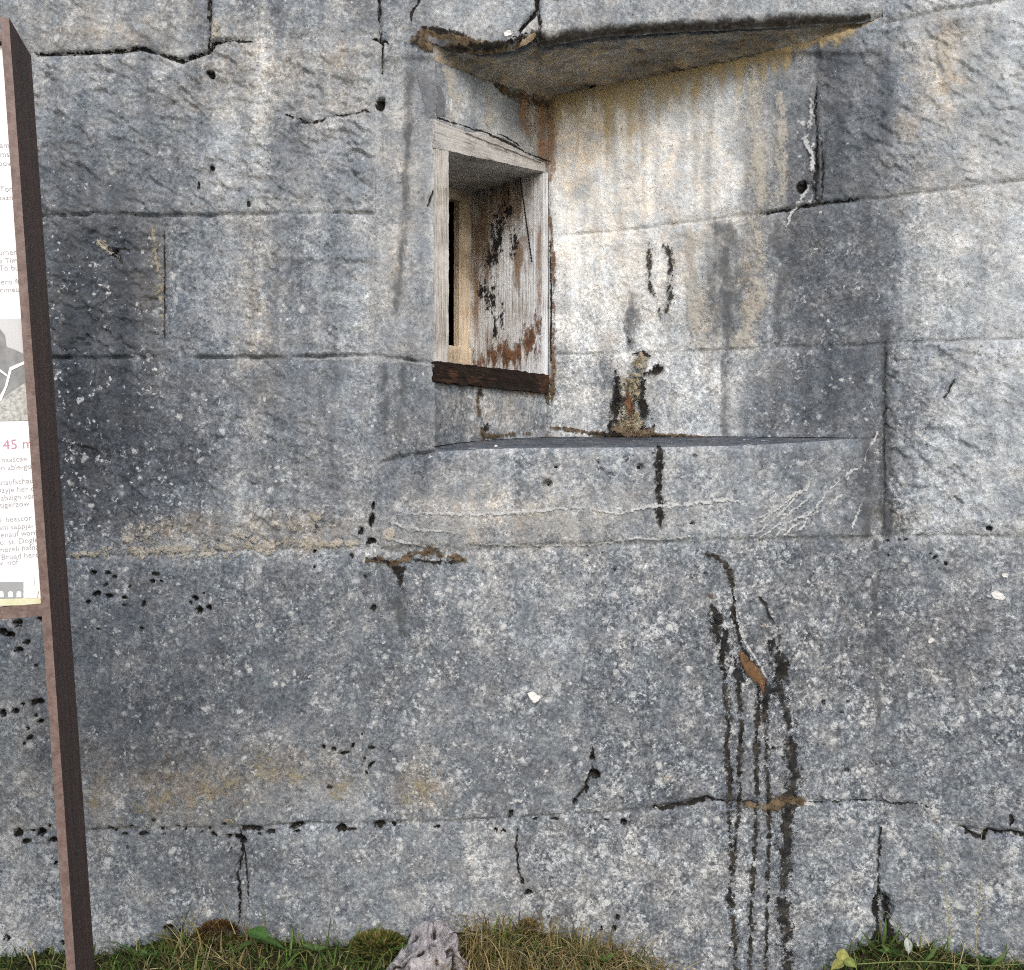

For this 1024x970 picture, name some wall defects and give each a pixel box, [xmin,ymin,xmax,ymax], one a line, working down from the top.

crack [36,0,253,64]
crack [285,109,369,123]
damp [534,12,871,435]
rust [472,202,557,404]
damp [365,299,741,636]
damp [860,465,894,552]
crack [575,746,594,799]
damp [704,549,804,970]
crack [236,830,249,924]
crack [874,827,882,899]
crack [963,814,1024,840]